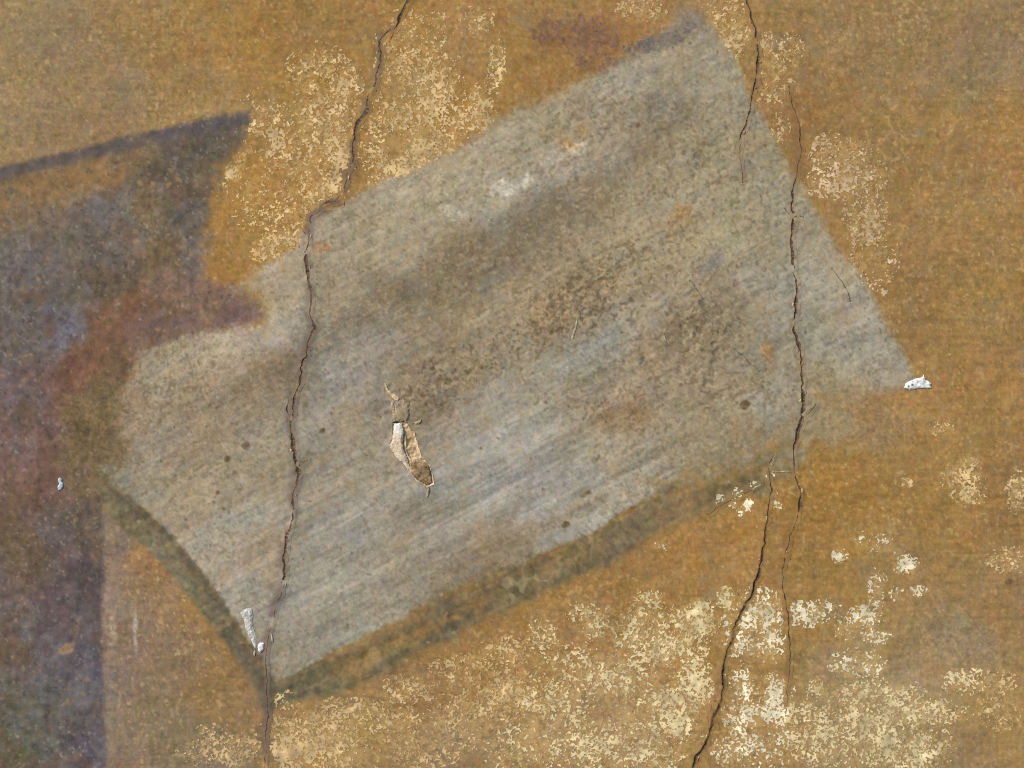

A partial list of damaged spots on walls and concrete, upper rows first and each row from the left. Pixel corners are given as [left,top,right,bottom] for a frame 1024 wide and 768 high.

damp [525,1,717,78]
damp [761,15,845,59]
peeling [222,4,507,263]
efflorescence [438,136,593,222]
peeling [804,130,901,296]
crack [261,0,413,768]
peeling [379,238,674,498]
damp [550,321,629,376]
crack [689,0,818,768]
peeling [715,471,775,517]
damp [101,591,119,652]
peeling [175,531,1024,768]